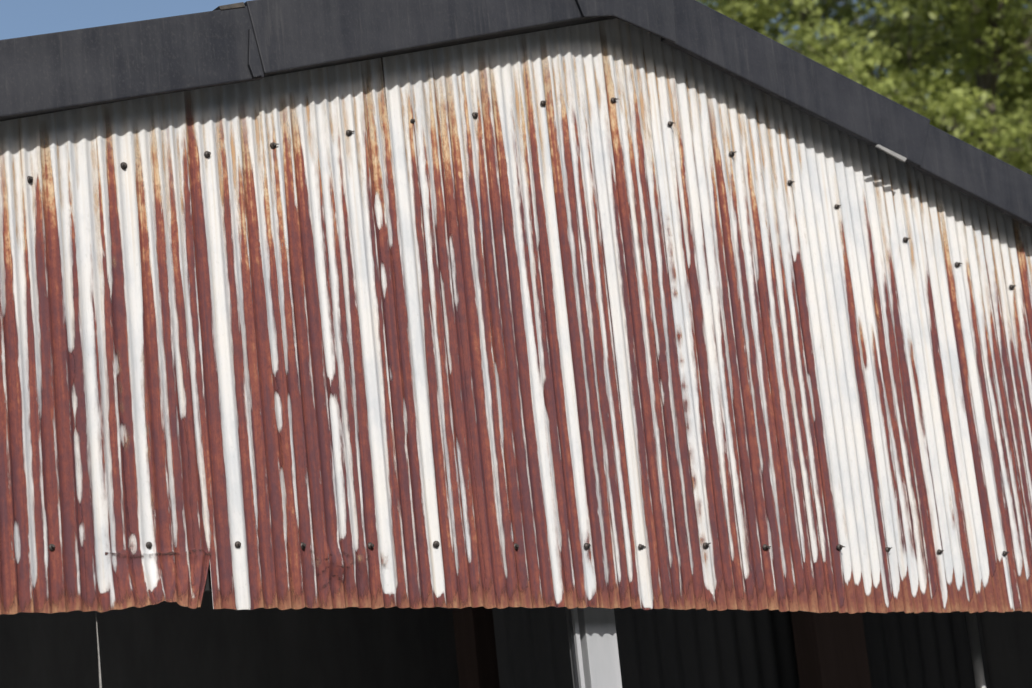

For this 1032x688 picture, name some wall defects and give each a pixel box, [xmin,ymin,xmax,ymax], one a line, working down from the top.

rust [0,108,236,615]
rust [220,50,1032,614]